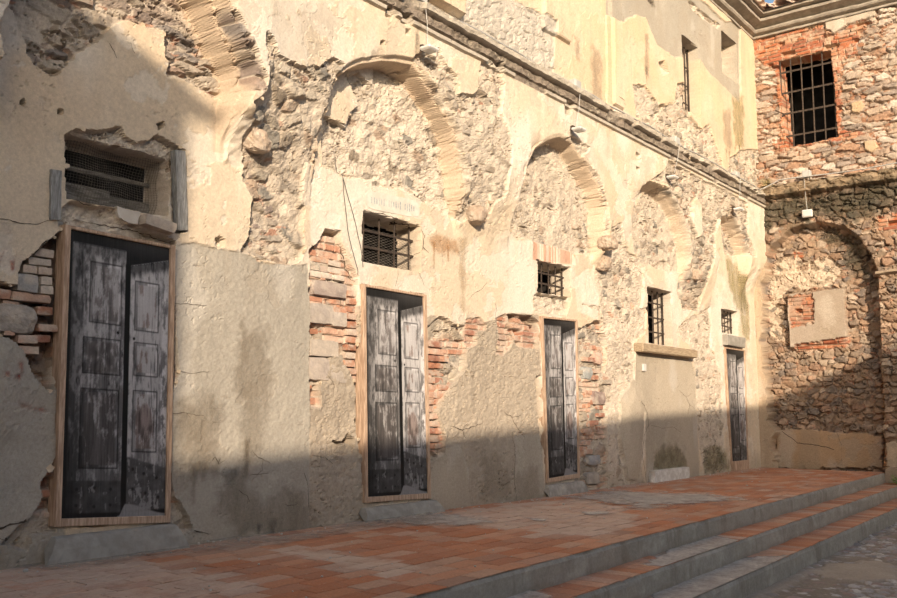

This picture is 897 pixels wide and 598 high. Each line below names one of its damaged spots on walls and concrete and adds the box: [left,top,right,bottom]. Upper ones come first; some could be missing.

crack [0,519,27,540]
flaking render [0,0,513,408]
flaking render [427,292,572,459]
flaking render [510,83,763,489]